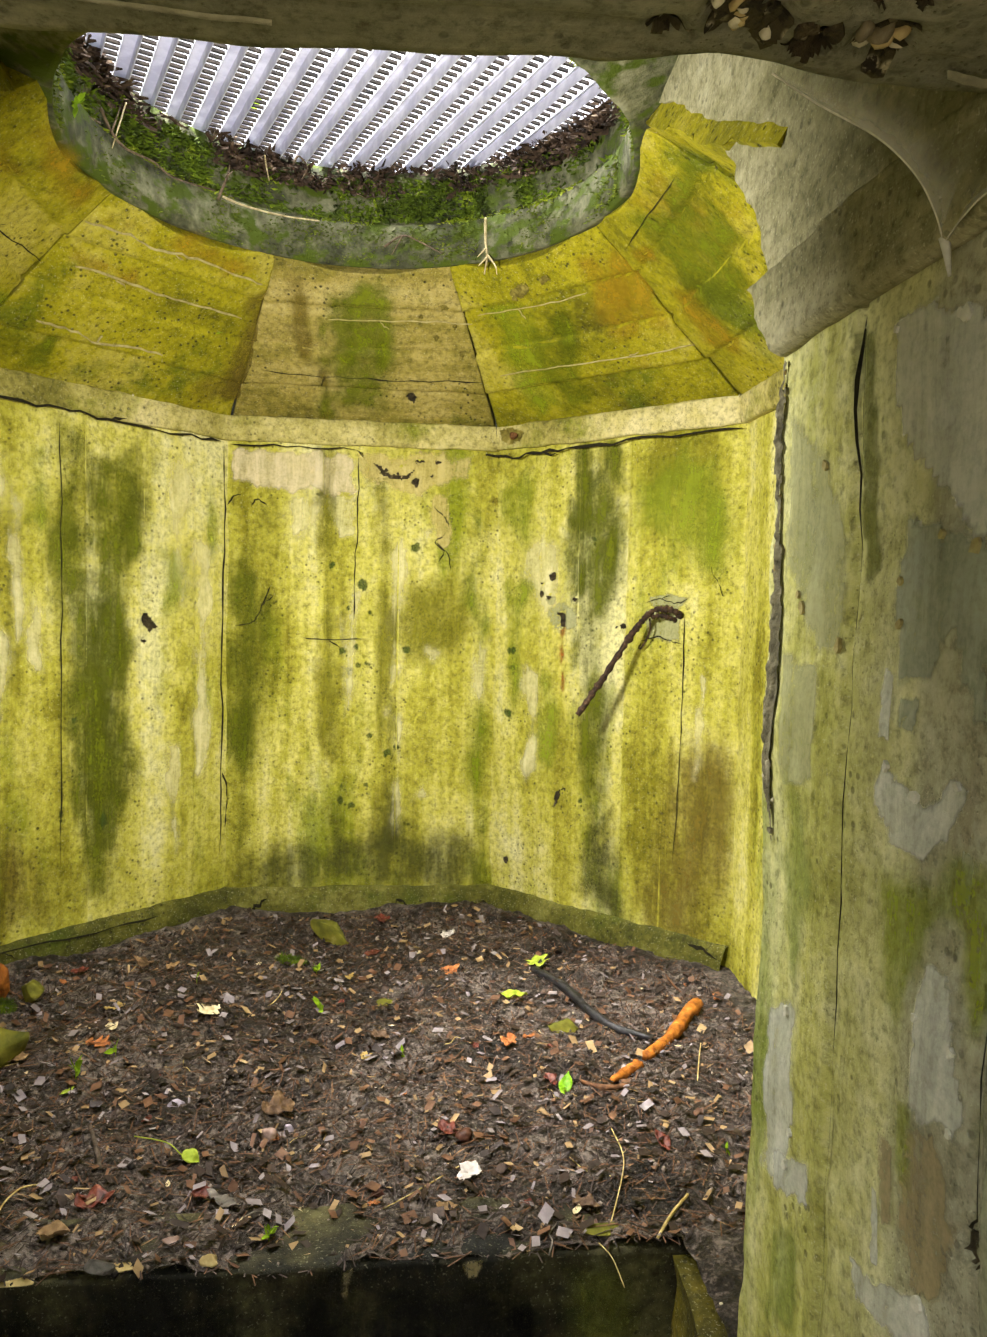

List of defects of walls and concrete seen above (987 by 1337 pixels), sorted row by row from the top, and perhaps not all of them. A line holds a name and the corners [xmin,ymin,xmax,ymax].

spalling [645,0,934,78]
water stain [126,496,142,561]
peeling [232,449,470,548]
water stain [569,441,621,538]
water stain [603,525,617,587]
peeling [879,302,987,740]
water stain [85,604,132,844]
crack [824,319,867,1190]
peeling [875,760,966,859]
water stain [584,826,618,916]
peeling [909,966,962,1140]
peeling [763,1004,807,1204]